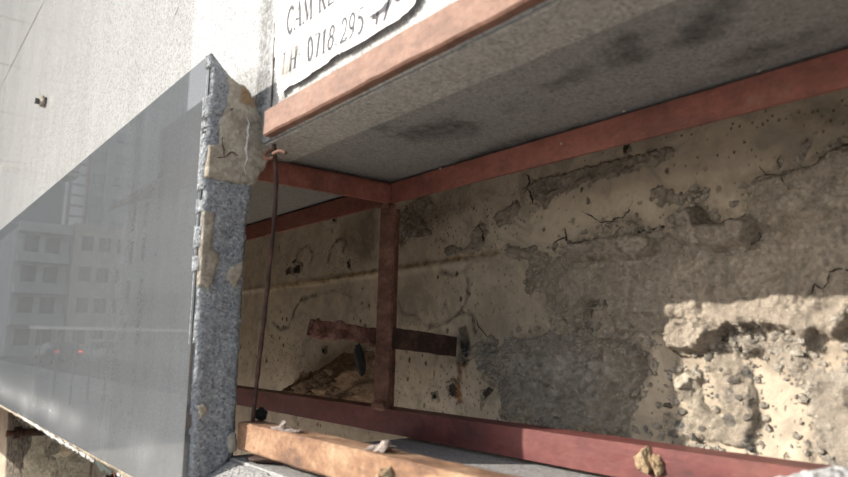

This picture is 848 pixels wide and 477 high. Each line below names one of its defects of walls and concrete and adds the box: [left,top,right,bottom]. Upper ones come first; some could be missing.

crack [217,137,239,158]
peeling [521,143,675,210]
peeling [649,185,703,208]
crack [751,143,848,191]
peeling [444,199,521,258]
spalling [188,56,251,477]
peeling [502,243,552,298]
crack [809,268,848,295]
corrosion [456,329,469,403]
spalling [642,335,777,455]
spalling [19,416,122,477]